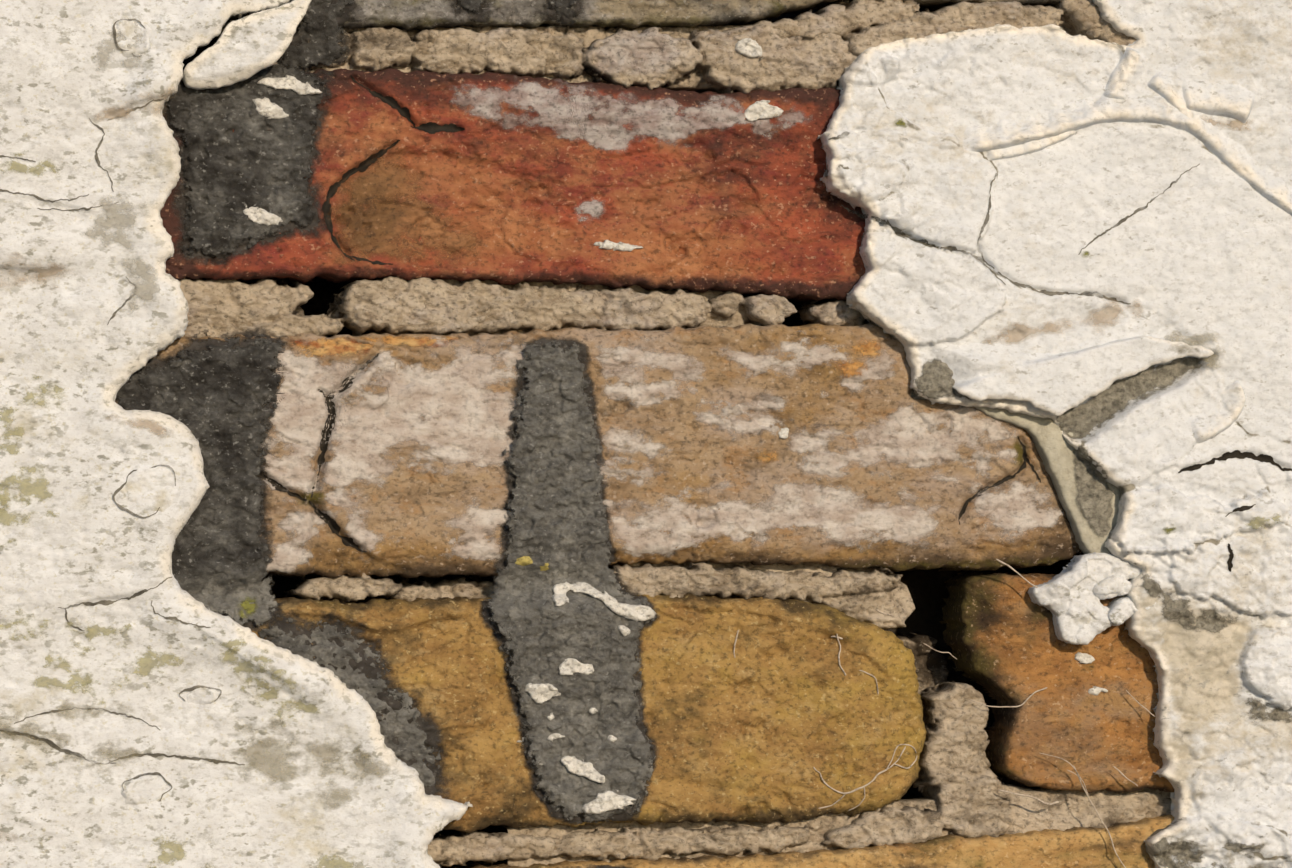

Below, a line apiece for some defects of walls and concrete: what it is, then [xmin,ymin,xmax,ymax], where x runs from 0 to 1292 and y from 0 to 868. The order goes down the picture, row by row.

peeling [594,240,643,252]
crack [841,175,1131,304]
crack [1078,163,1200,255]
flaking render [0,0,477,868]
crack [256,353,379,552]
crack [959,437,1041,525]
flaking render [816,0,1292,868]
crack [1178,450,1292,473]
crack [0,708,245,765]